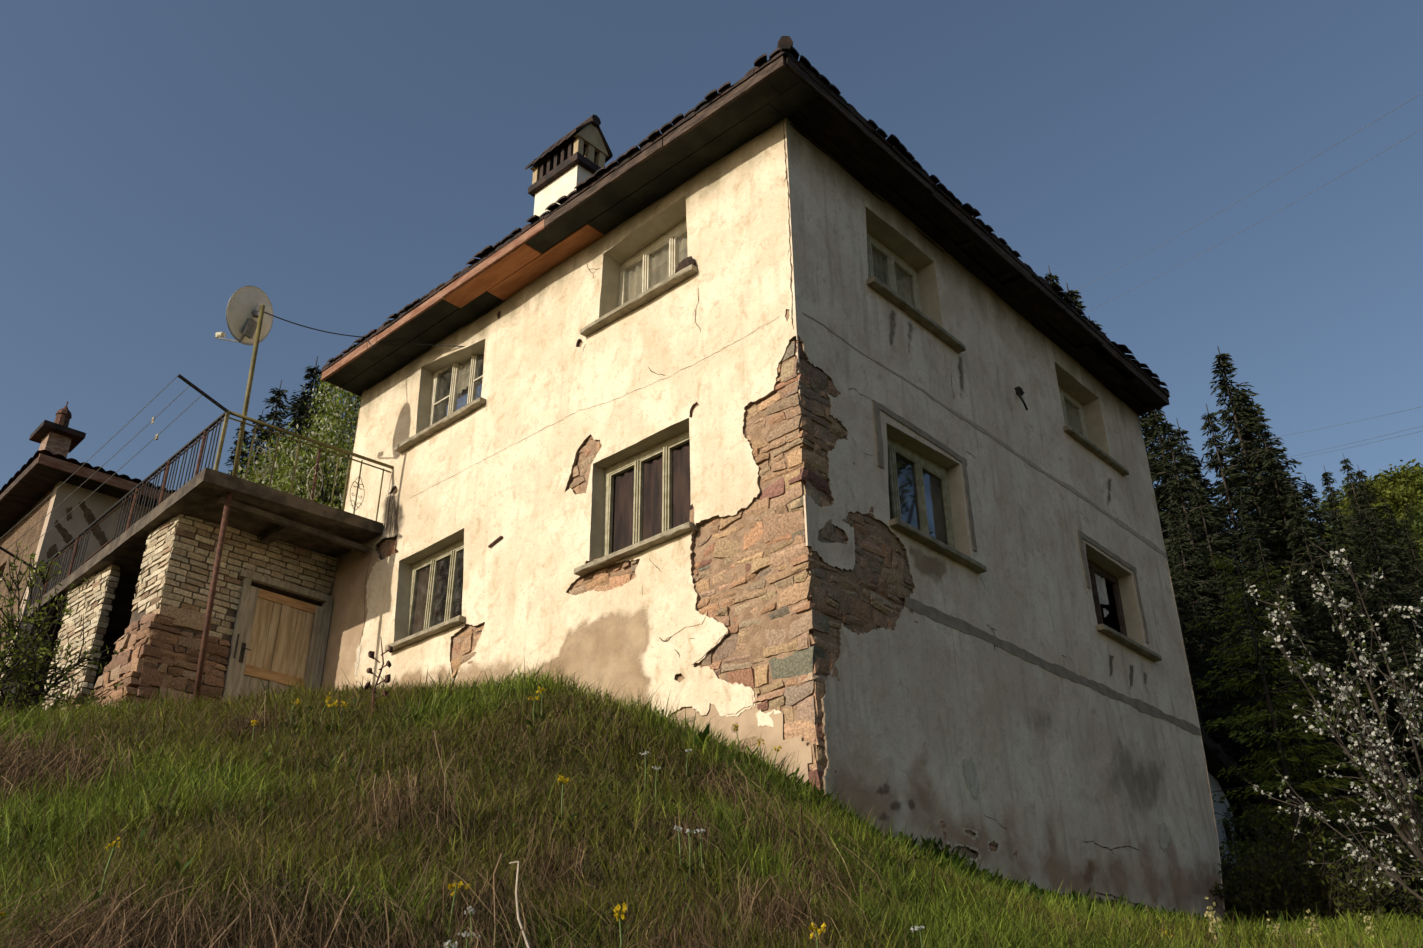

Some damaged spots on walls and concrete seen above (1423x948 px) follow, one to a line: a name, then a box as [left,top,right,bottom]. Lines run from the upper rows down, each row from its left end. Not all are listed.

crack [414,124,793,496]
damp [389,664,521,692]
flaking render [451,623,485,678]
flaking render [526,310,1201,792]